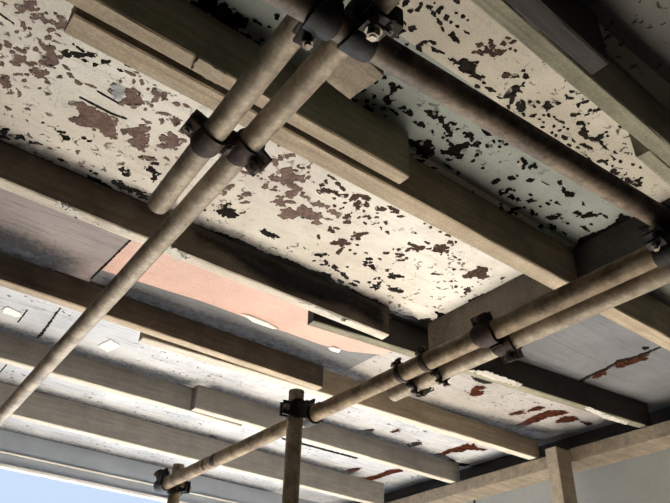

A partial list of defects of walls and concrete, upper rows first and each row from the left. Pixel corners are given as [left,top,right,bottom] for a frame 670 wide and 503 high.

peeling [397,0,470,44]
peeling [0,0,111,97]
peeling [68,64,191,183]
peeling [350,76,509,175]
peeling [395,20,643,187]
peeling [203,184,252,219]
peeling [240,152,490,331]
crack [37,307,61,337]
rust [469,386,485,397]
rust [509,406,592,427]
rust [439,443,487,455]
rust [364,469,403,480]